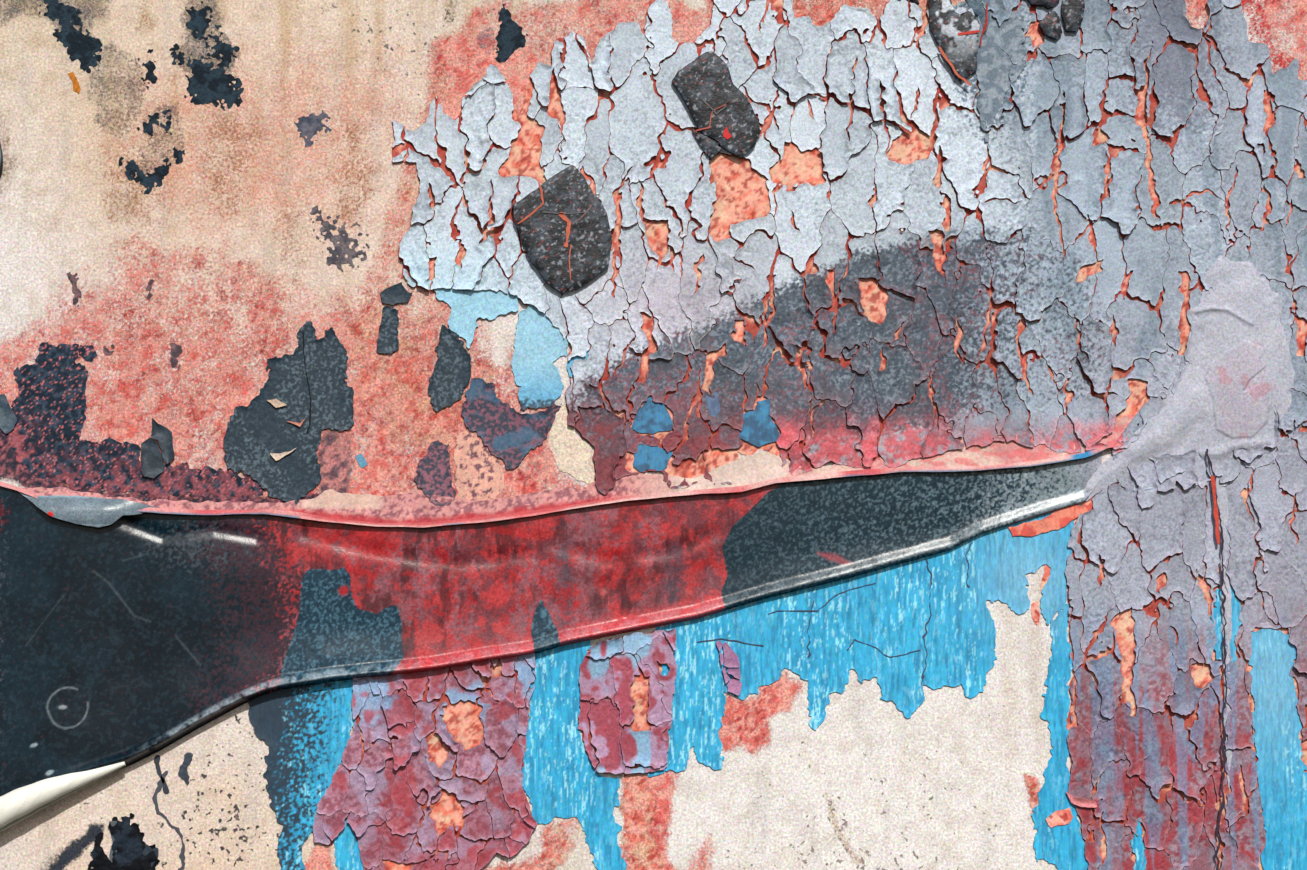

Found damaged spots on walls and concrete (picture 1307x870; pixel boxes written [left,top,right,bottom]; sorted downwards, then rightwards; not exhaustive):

peeling [67,271,82,306]
peeling [170,342,183,370]
peeling [0,394,17,434]
peeling [141,418,175,478]
peeling [377,0,1307,870]
peeling [313,653,538,870]
spalling [87,813,160,870]
crack [152,755,185,870]